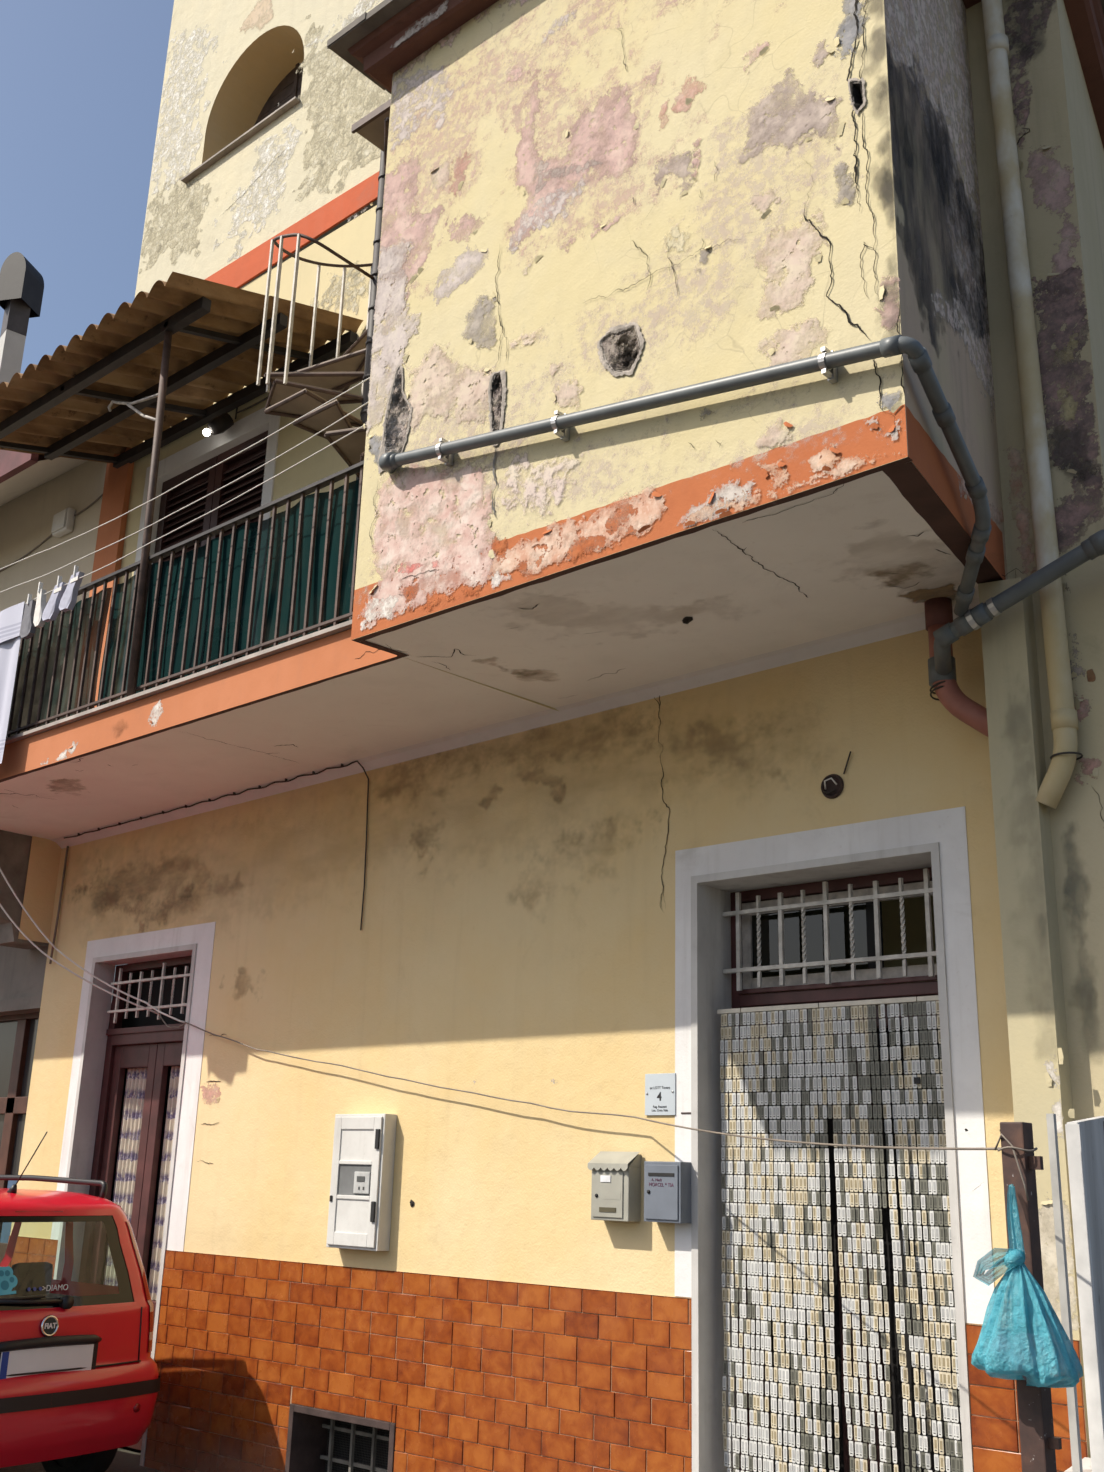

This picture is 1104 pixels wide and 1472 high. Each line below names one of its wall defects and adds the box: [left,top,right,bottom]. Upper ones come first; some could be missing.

peeling [1004,0,1055,149]
crack [491,448,499,518]
crack [495,252,507,364]
peeling [139,0,906,630]
crack [712,485,844,597]
crack [804,0,905,424]
peeling [738,0,995,411]
leakage [883,43,986,349]
peeling [1031,267,1104,554]
peeling [148,699,164,727]
crack [654,696,670,911]